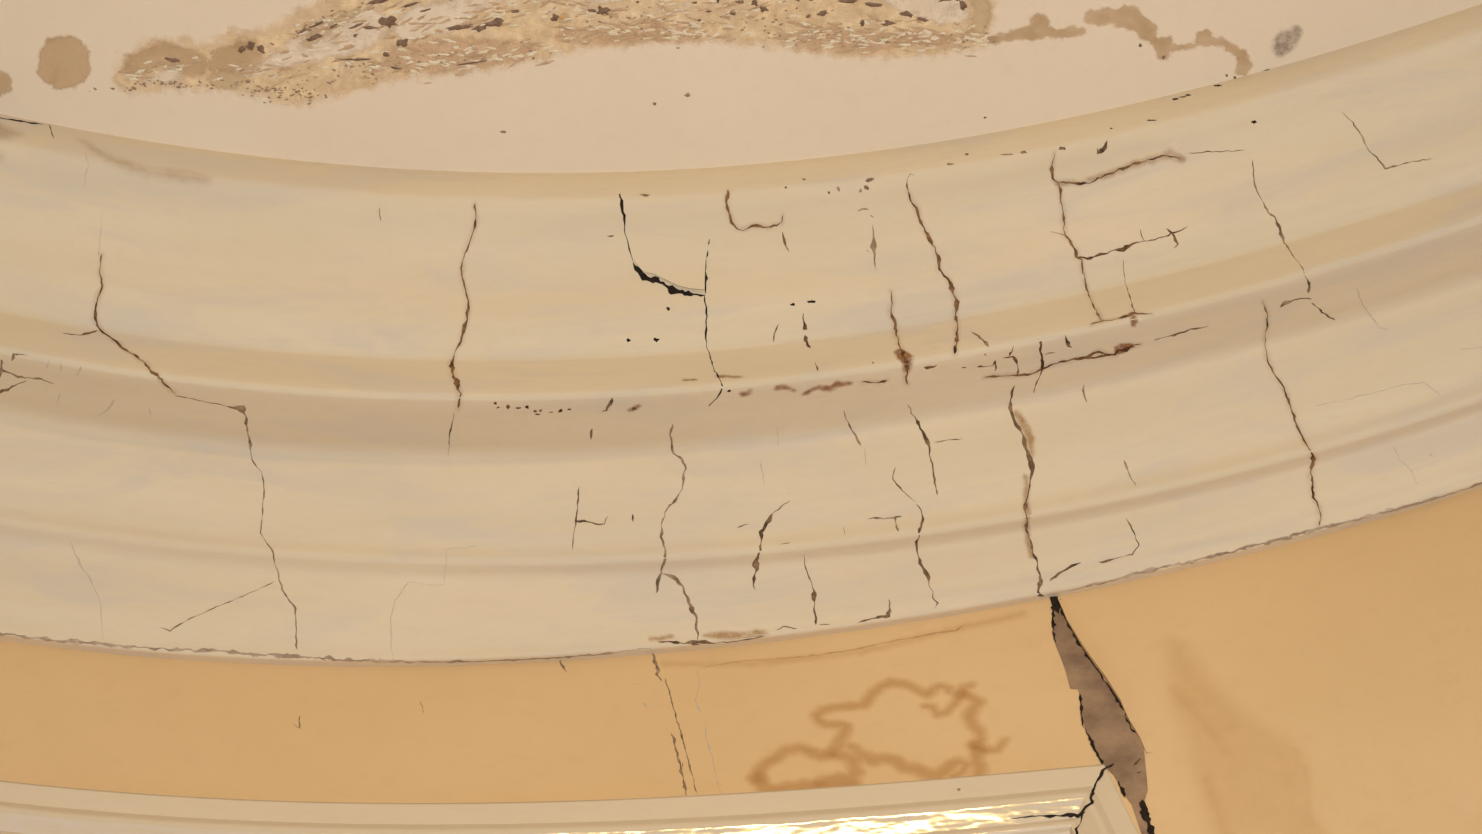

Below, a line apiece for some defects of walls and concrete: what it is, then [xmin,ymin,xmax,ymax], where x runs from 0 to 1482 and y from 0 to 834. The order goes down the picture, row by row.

peeling [89,0,999,105]
crack [1343,113,1432,170]
crack [0,141,1482,796]
crack [1010,763,1155,834]